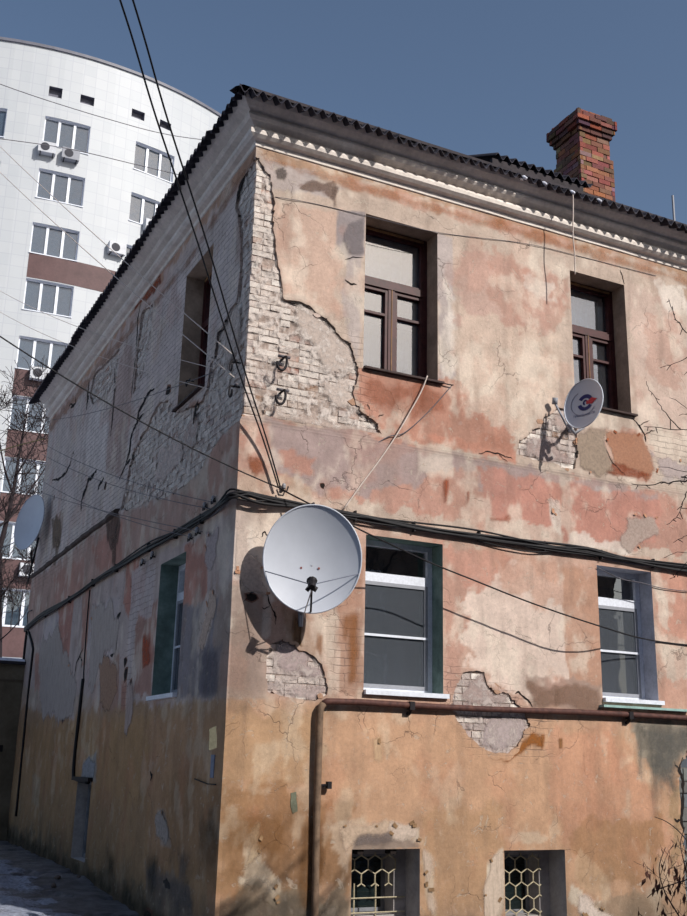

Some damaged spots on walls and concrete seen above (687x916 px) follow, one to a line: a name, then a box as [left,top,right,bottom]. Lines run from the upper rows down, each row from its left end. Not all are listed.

flaking render [122,159,379,511]
crack [52,305,154,508]
flaking render [517,409,687,480]
peeling [99,655,133,734]
flaking render [266,640,327,701]
flaking render [451,671,529,753]
water stain [644,728,687,786]